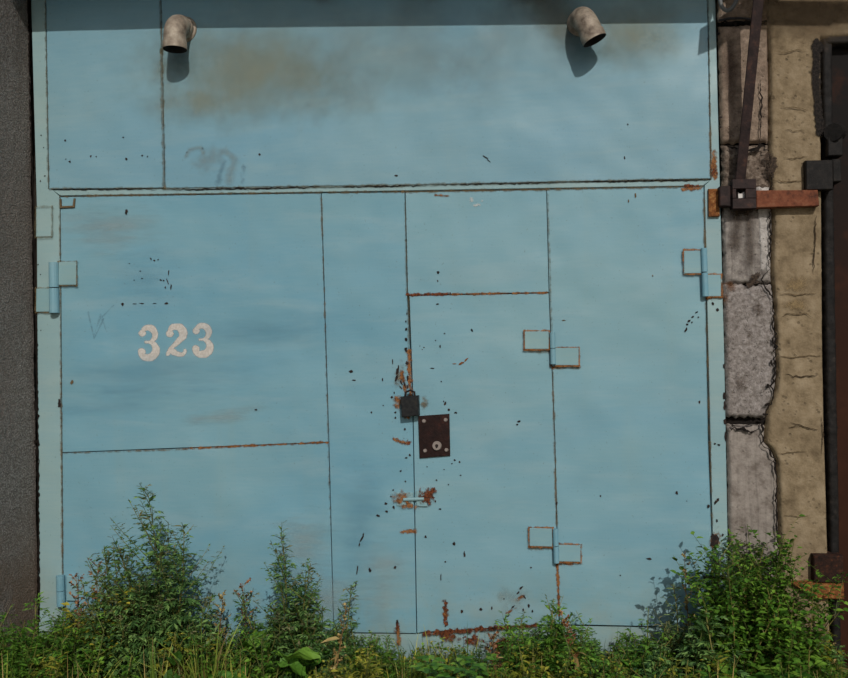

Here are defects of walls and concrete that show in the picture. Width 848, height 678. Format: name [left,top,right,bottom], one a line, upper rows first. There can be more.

crack [727,80,806,188]
rust [710,151,718,180]
rust [394,371,407,408]
crack [729,208,820,554]
rust [392,488,437,508]
rust [464,634,515,656]